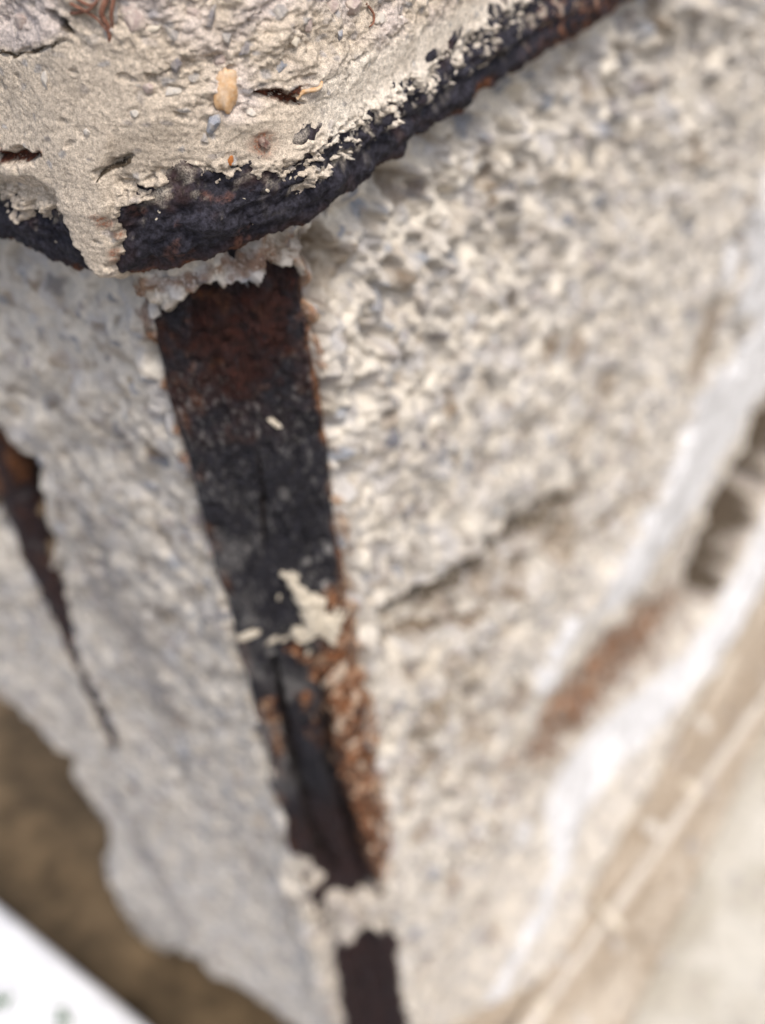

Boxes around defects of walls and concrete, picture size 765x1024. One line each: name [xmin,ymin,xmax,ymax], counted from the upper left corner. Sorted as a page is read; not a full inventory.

spalling [0,238,307,1007]
rust [292,259,319,325]
rust [285,573,393,878]
spalling [298,0,765,925]
peeling [470,518,765,1013]